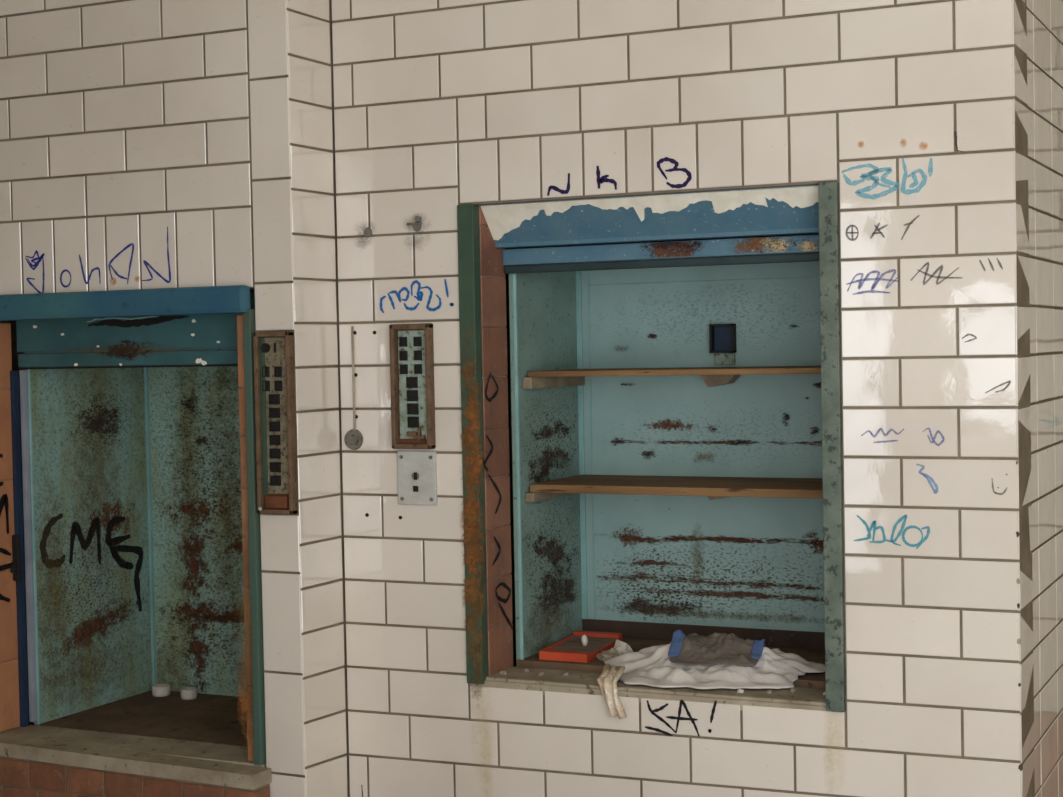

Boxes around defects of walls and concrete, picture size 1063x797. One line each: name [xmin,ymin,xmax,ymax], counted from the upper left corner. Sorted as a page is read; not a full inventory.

peeling [481,185,819,240]
corrosion [645,241,700,258]
corrosion [738,237,817,253]
corrosion [102,340,151,360]
corrosion [611,419,757,457]
corrosion [461,349,483,665]
corrosion [43,397,138,684]
corrosion [162,394,250,737]
corrosion [598,527,824,620]